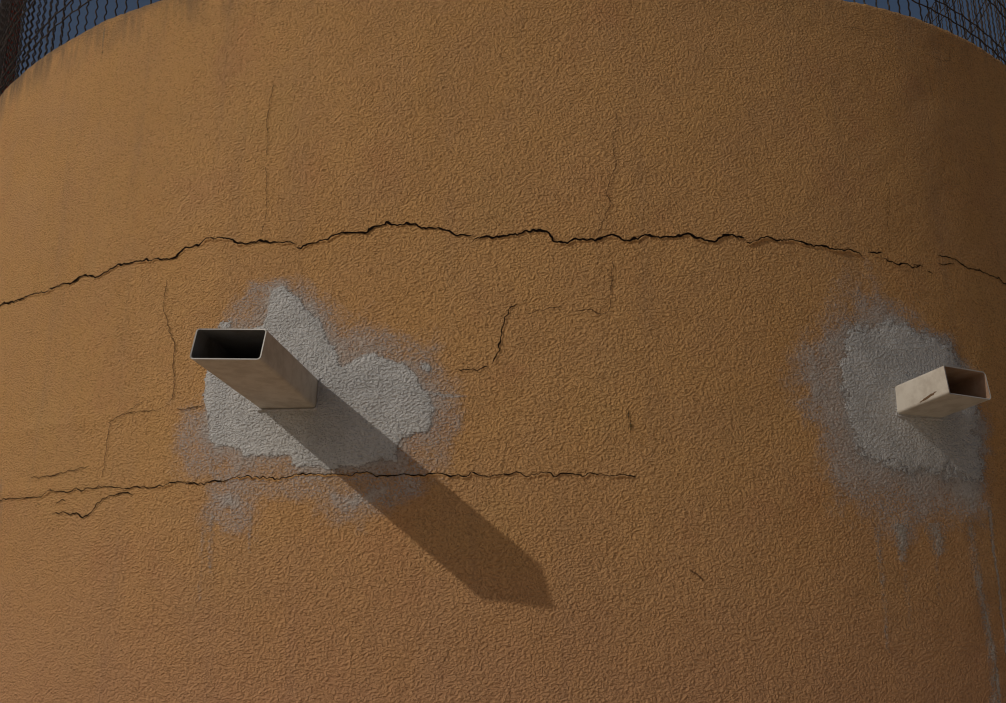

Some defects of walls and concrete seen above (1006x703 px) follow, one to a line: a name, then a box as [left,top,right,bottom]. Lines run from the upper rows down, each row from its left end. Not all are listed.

crack [0,85,1006,518]